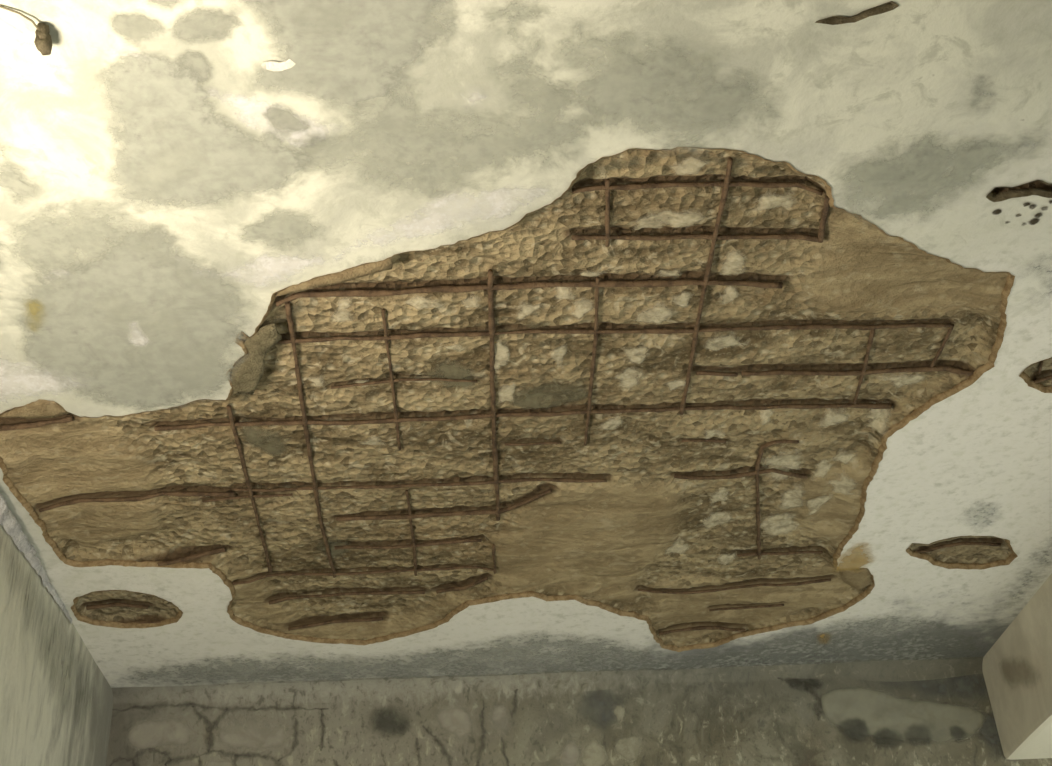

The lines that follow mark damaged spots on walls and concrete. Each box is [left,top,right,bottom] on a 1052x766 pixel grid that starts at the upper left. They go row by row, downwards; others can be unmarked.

water stain [104,0,769,245]
spalling [986,180,1052,225]
water stain [0,209,323,410]
spalling [0,147,1018,652]
spalling [1019,357,1052,393]
crack [162,703,338,766]
crack [478,702,508,766]